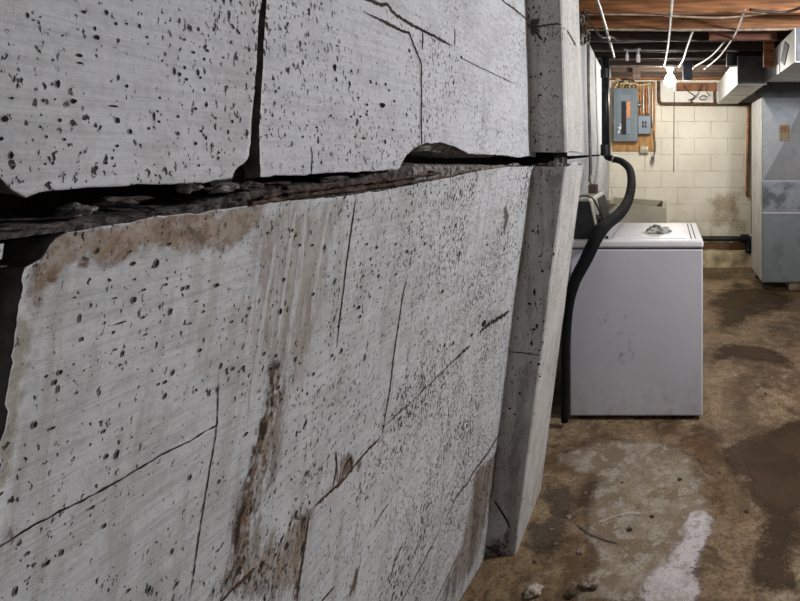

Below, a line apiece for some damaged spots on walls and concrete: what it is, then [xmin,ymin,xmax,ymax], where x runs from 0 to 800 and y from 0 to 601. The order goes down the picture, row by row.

crack [0,0,599,344]
crack [0,382,219,599]
crack [221,568,255,601]
crack [297,278,511,601]
damp [559,438,715,601]
damp [724,421,800,591]